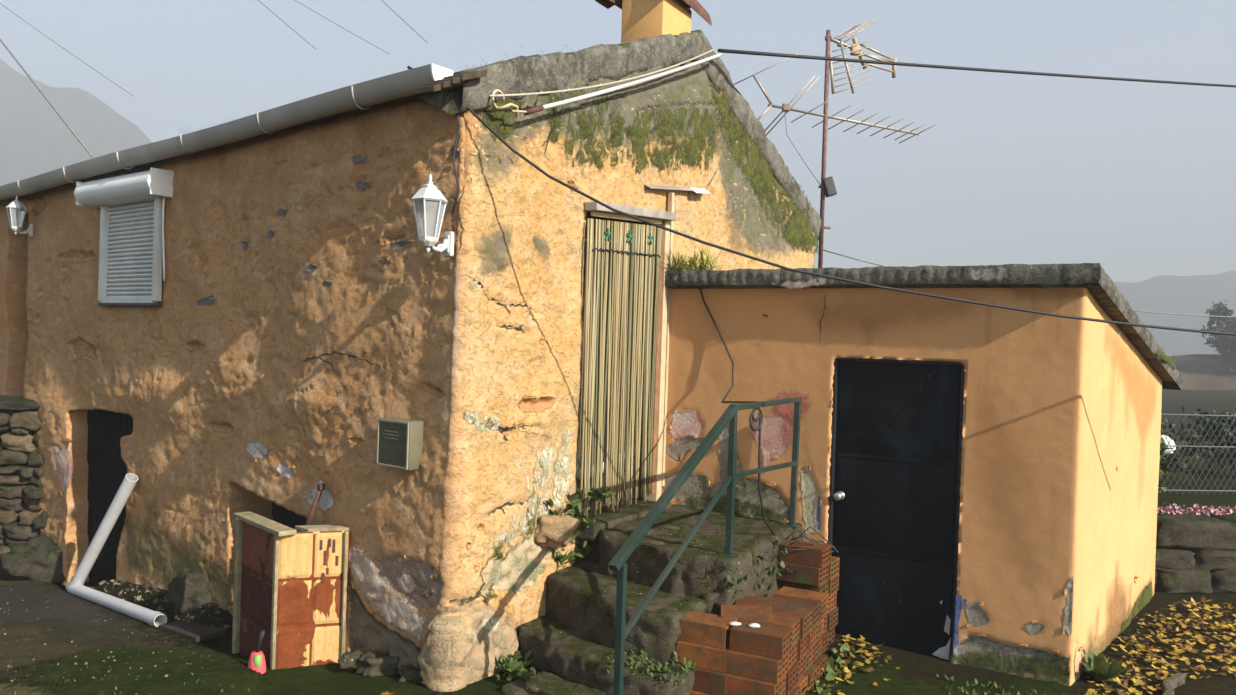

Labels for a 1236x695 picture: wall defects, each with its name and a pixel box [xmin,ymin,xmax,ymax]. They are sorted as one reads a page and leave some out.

water stain [474,54,794,255]
water stain [482,231,510,267]
water stain [783,279,825,288]
crack [299,351,384,373]
flaking render [664,409,821,534]
peeling [346,546,446,675]
flaking render [933,600,1084,686]
flaking render [1063,577,1073,636]
water stain [1078,581,1153,679]